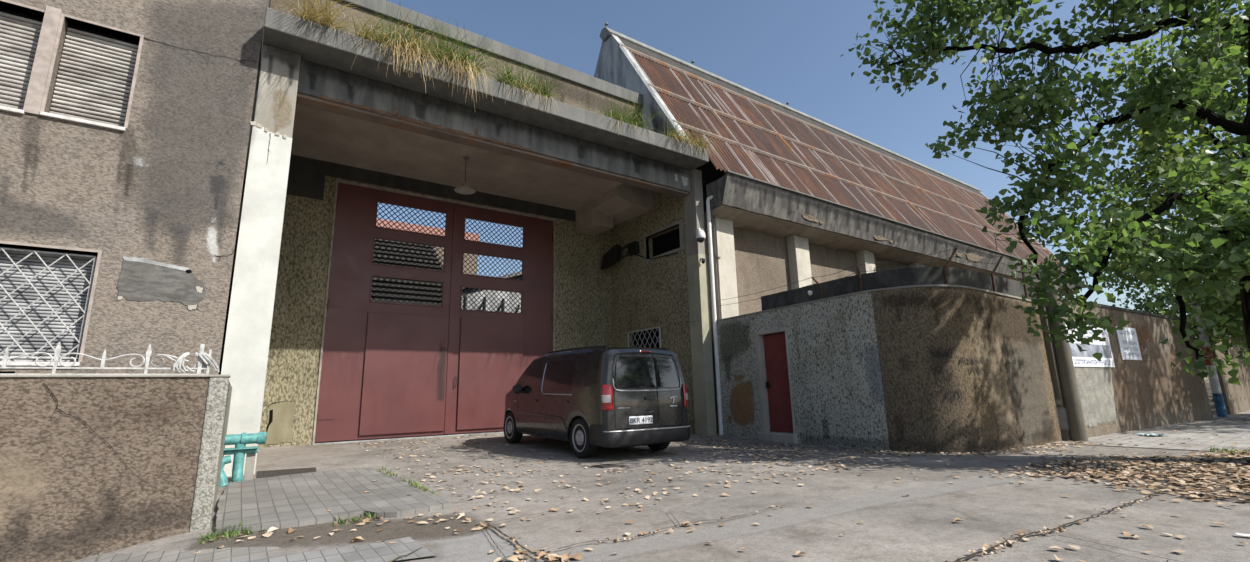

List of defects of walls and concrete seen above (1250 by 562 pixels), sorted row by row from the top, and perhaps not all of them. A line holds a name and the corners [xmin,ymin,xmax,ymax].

peeling [206,218,218,263]
crack [43,383,166,484]
peeling [728,375,754,425]
crack [482,483,783,562]
crack [953,495,1181,562]